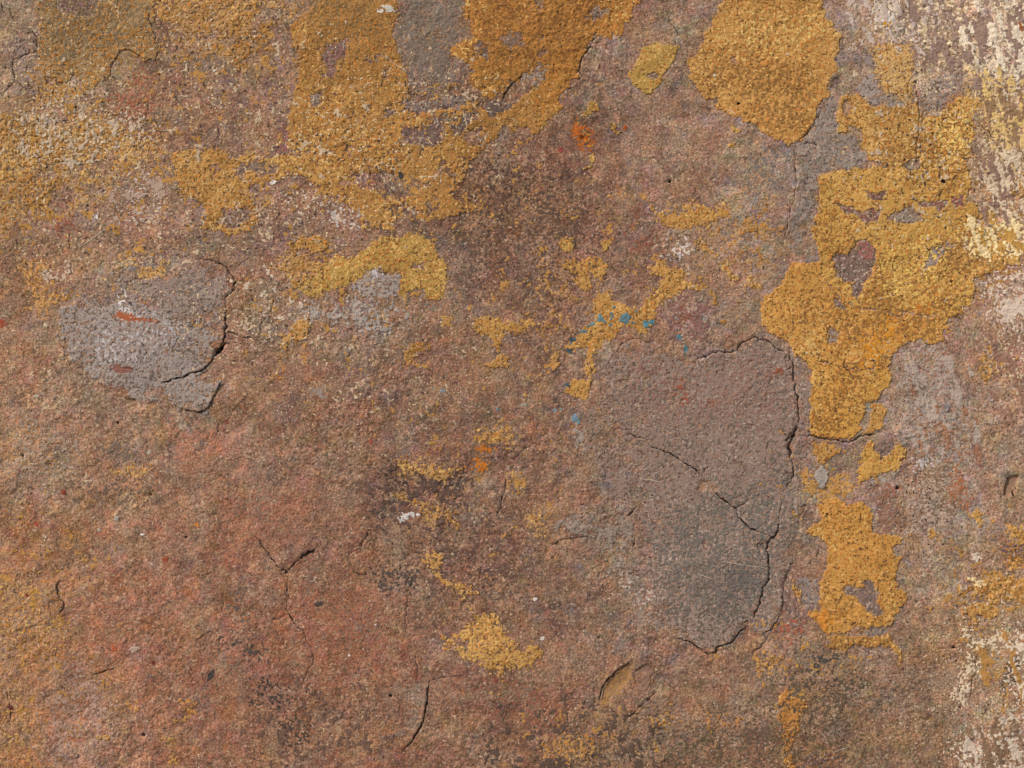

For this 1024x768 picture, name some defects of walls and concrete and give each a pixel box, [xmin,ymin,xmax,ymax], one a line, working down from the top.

crack [163,258,276,423]
crack [627,336,882,654]
crack [256,538,315,692]
crack [401,598,463,752]